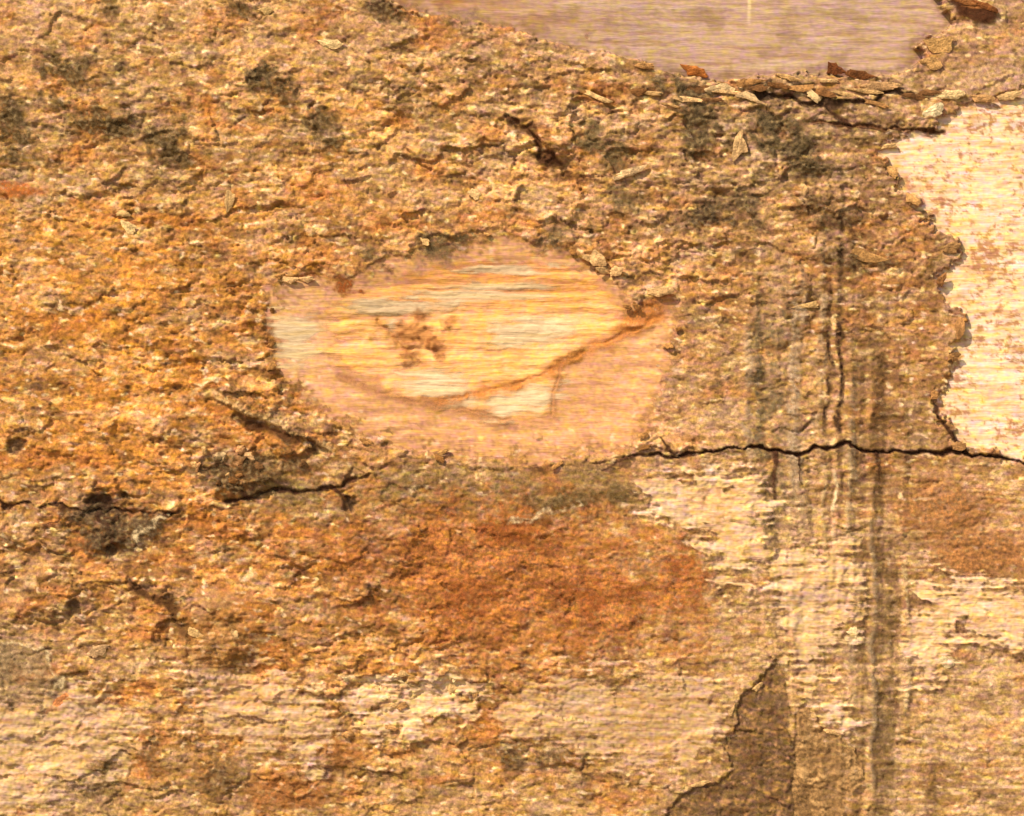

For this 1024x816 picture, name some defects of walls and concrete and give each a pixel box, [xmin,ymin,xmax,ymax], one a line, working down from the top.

peeling [384,0,1024,464]
damp [813,242,897,278]
peeling [190,445,264,486]
crack [224,470,360,511]
spalling [213,232,684,470]
damp [743,289,805,498]
crack [601,395,1024,510]
damp [815,298,856,432]
rust [327,486,711,673]
damp [861,656,911,761]